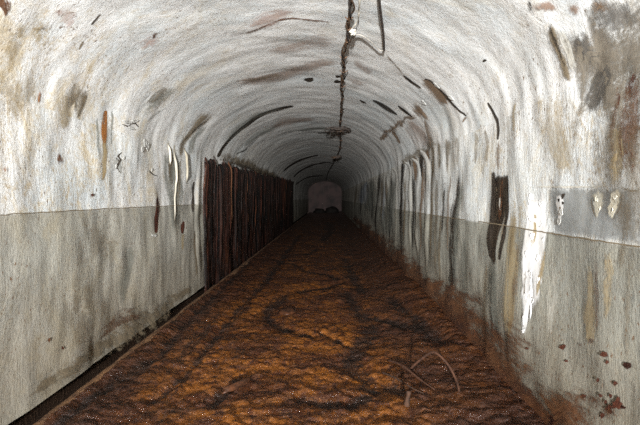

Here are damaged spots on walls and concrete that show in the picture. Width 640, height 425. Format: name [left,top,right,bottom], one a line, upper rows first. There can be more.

corrosion [97,111,113,180]
corrosion [203,155,294,292]
damp [354,174,392,235]
damp [400,120,463,285]
corrosion [352,216,603,425]
damp [483,172,521,347]
peeling [521,185,639,333]
damp [549,0,640,178]